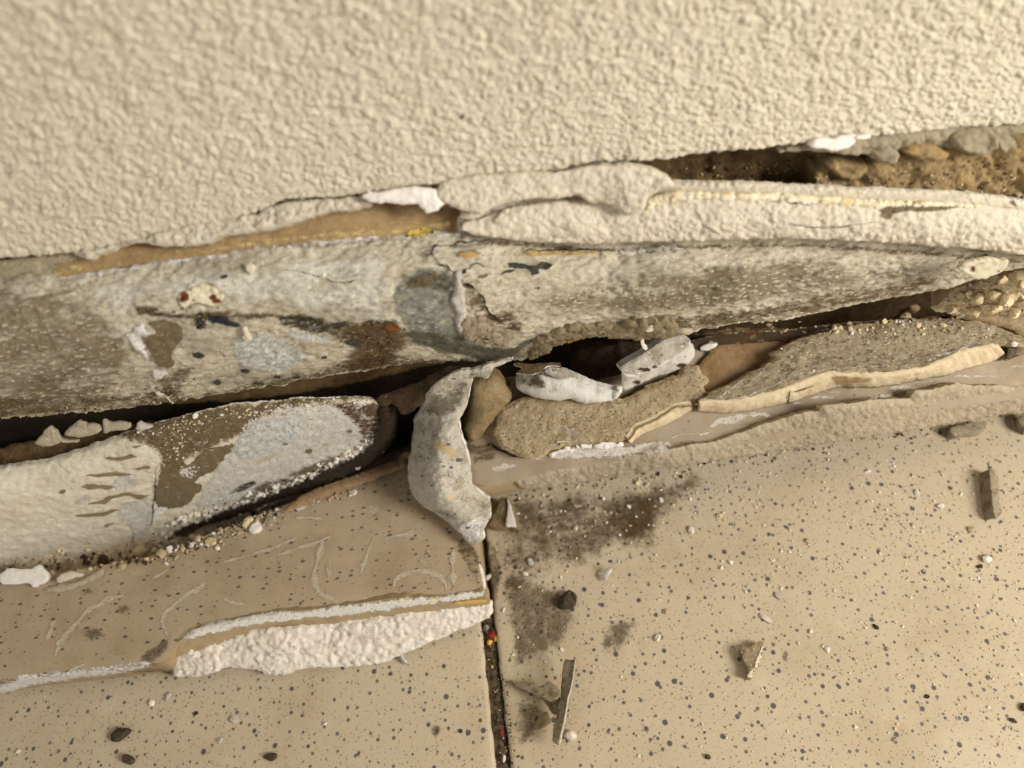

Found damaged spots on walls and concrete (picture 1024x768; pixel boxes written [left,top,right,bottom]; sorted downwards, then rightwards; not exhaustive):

crack [547,151,634,173]
peeling [0,123,1024,319]
crack [770,201,875,228]
peeling [146,319,183,369]
flaking render [242,326,252,342]
peeling [545,367,579,379]
spalling [626,343,1006,443]
flaking render [35,418,153,447]
peeling [155,443,234,509]
flaking render [243,516,276,534]
flaking render [146,540,173,559]